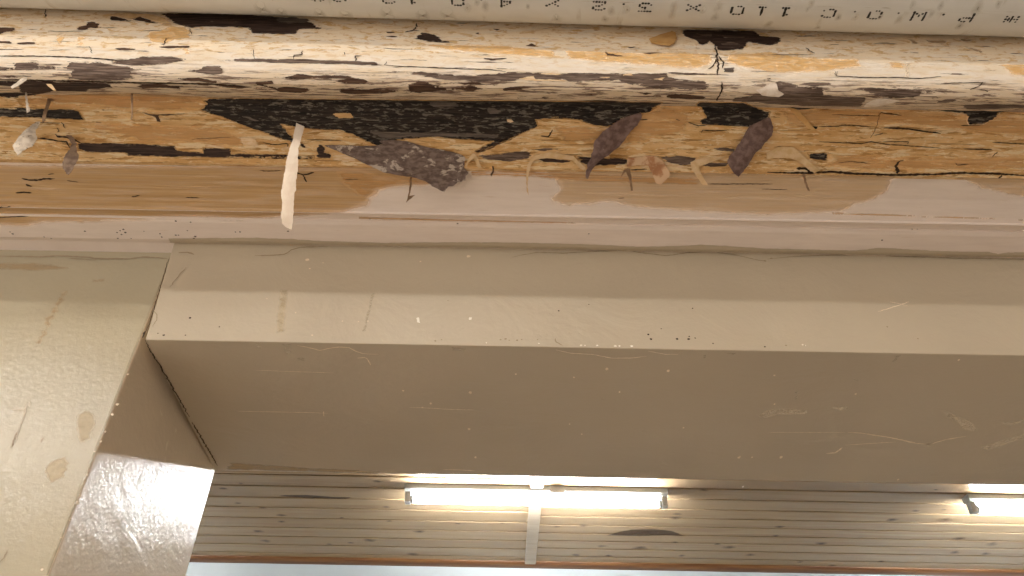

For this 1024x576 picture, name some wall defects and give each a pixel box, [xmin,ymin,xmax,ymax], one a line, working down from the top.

peeling [0,27,35,44]
peeling [77,13,328,34]
peeling [414,32,452,43]
peeling [646,29,780,54]
crack [708,46,725,101]
peeling [0,46,1024,230]
crack [8,252,218,466]